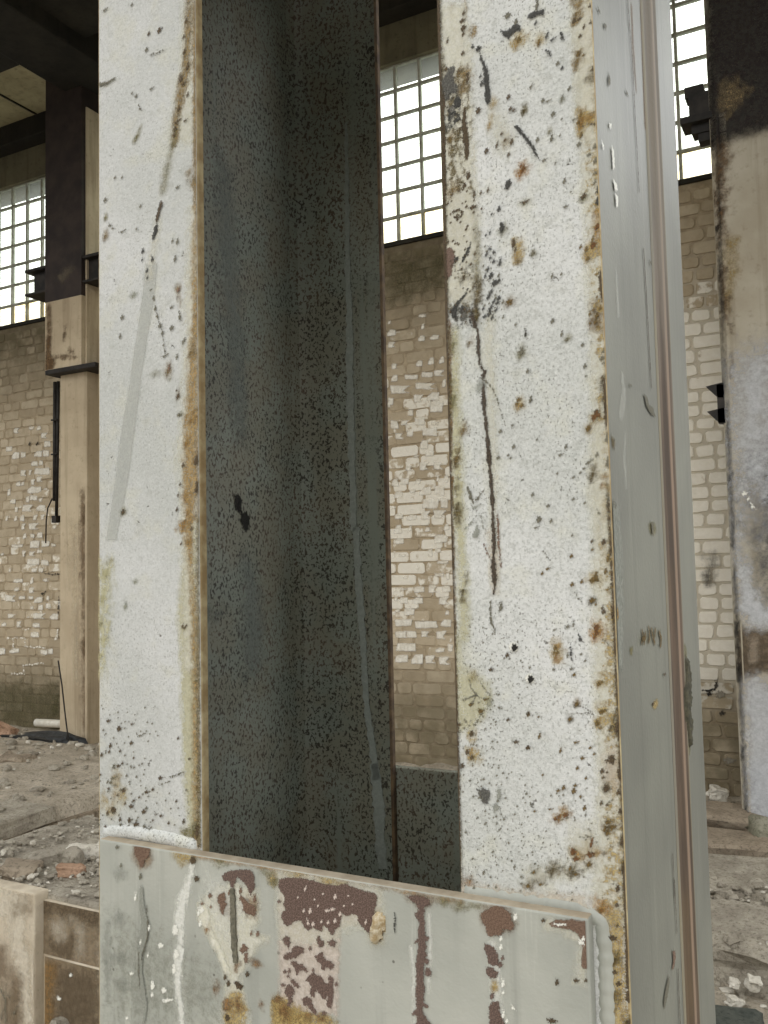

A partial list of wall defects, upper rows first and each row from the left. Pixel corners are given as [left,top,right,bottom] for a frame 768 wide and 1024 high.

rust [165,1,201,882]
rust [437,0,526,883]
crack [471,314,506,633]
rust [523,0,631,1024]
peeling [134,886,151,1024]
rust [213,974,247,1024]
peeling [201,869,378,1023]
rust [261,997,338,1024]